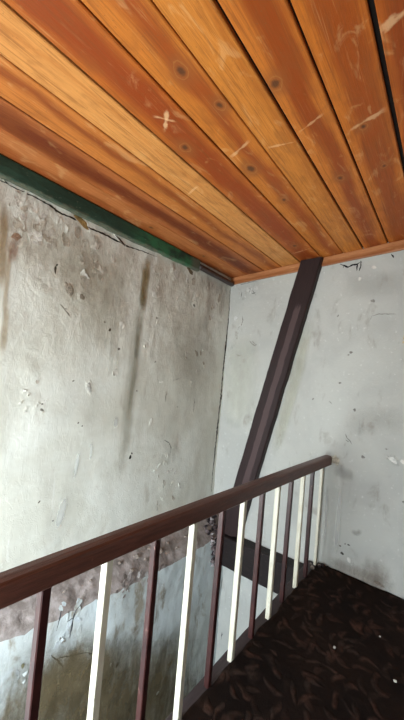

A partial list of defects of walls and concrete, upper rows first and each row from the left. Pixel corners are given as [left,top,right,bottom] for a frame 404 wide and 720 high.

crack [0,180,157,257]
damp [140,265,149,306]
flaking render [202,515,218,567]
flaking render [116,567,148,598]
peeling [54,598,82,649]
damp [3,684,28,720]
damp [38,651,93,720]
damp [98,646,142,720]
damp [145,640,196,720]